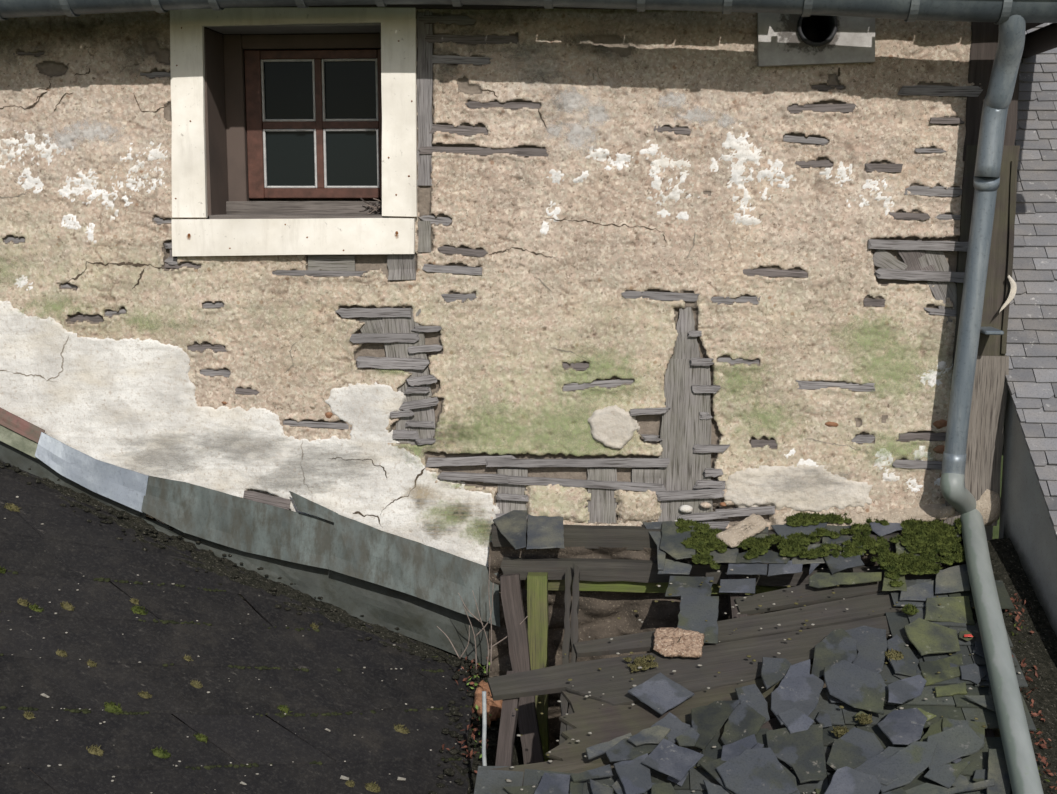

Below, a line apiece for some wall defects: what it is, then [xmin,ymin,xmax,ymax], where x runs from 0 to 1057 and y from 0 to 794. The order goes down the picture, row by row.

crack [0,68,90,111]
spalling [272,10,549,282]
peeling [546,125,711,221]
peeling [709,124,962,226]
peeling [540,201,561,235]
crack [61,261,162,289]
spalling [162,240,201,271]
spalling [743,266,808,278]
spalling [863,236,968,323]
crack [0,336,69,382]
flaking render [0,289,946,567]
crack [329,457,425,528]